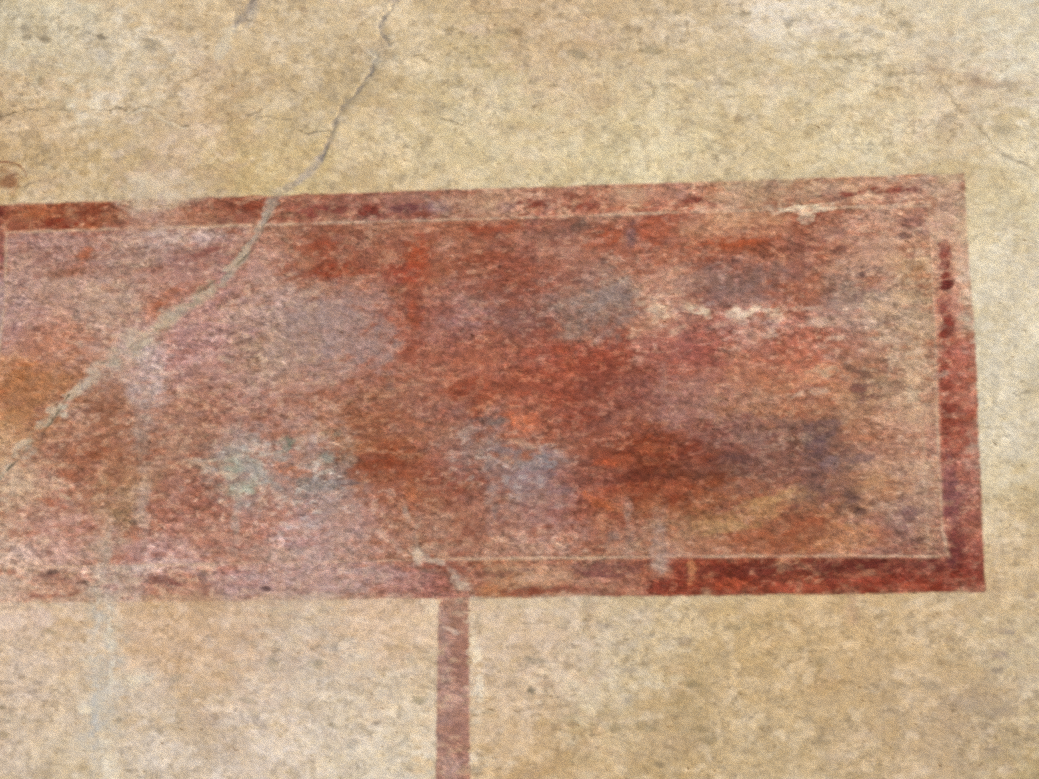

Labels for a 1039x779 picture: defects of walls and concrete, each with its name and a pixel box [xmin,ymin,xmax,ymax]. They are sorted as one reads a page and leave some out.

crack [0,0,405,482]